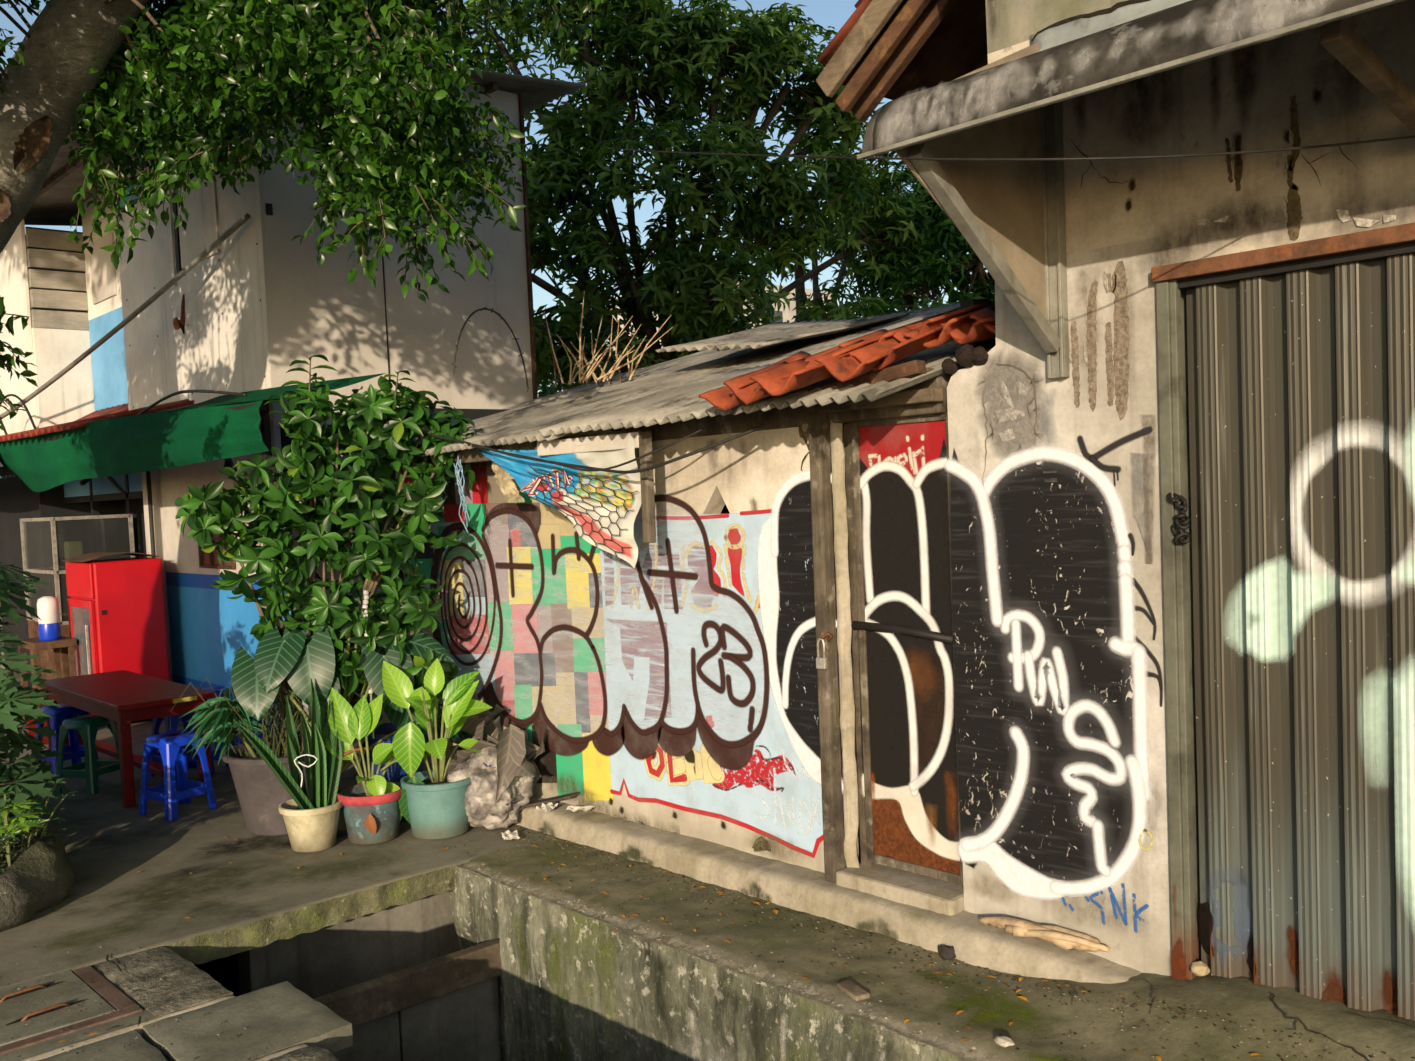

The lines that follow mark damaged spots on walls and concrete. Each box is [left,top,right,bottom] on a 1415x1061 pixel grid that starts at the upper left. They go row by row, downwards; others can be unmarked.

crack [1070,139,1134,189]
peeling [1225,135,1243,191]
peeling [1282,95,1302,241]
damp [1154,207,1280,267]
peeling [1069,260,1130,420]
rust [1171,938,1186,980]
rust [1288,925,1298,975]
rust [1383,971,1397,1015]